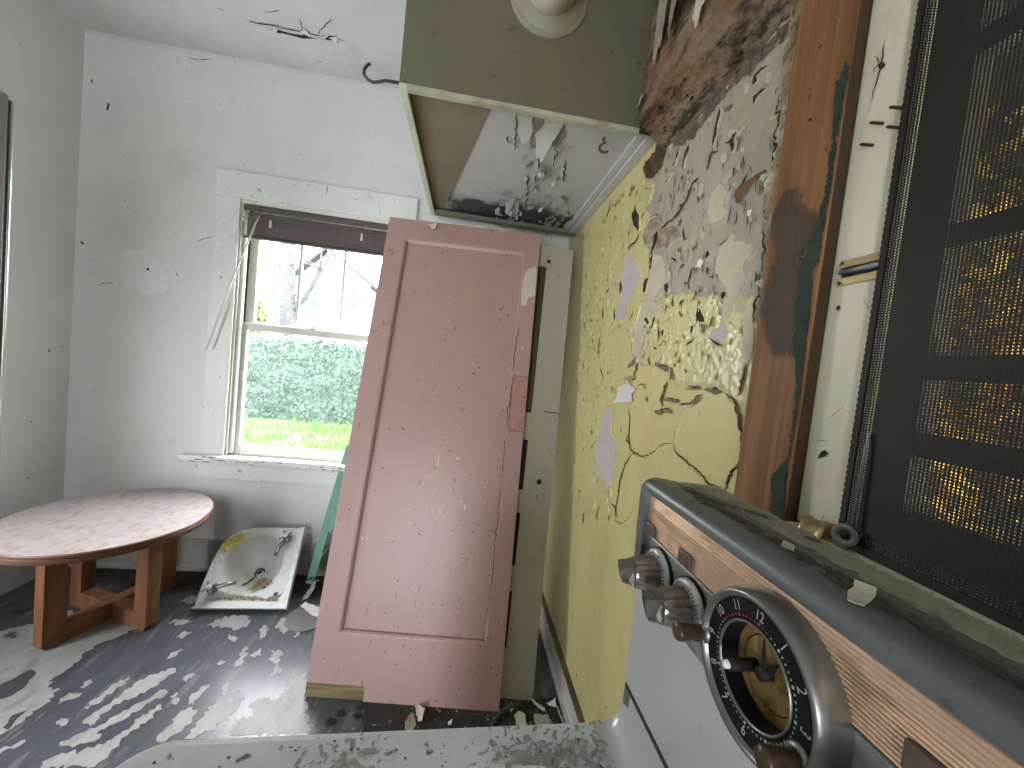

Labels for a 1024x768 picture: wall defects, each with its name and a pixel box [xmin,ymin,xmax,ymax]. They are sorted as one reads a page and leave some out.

crack [246,10,345,62]
peeling [495,114,570,236]
crack [569,98,782,528]
peeling [594,0,802,491]
leakage [757,168,819,362]
peeling [0,615,312,768]